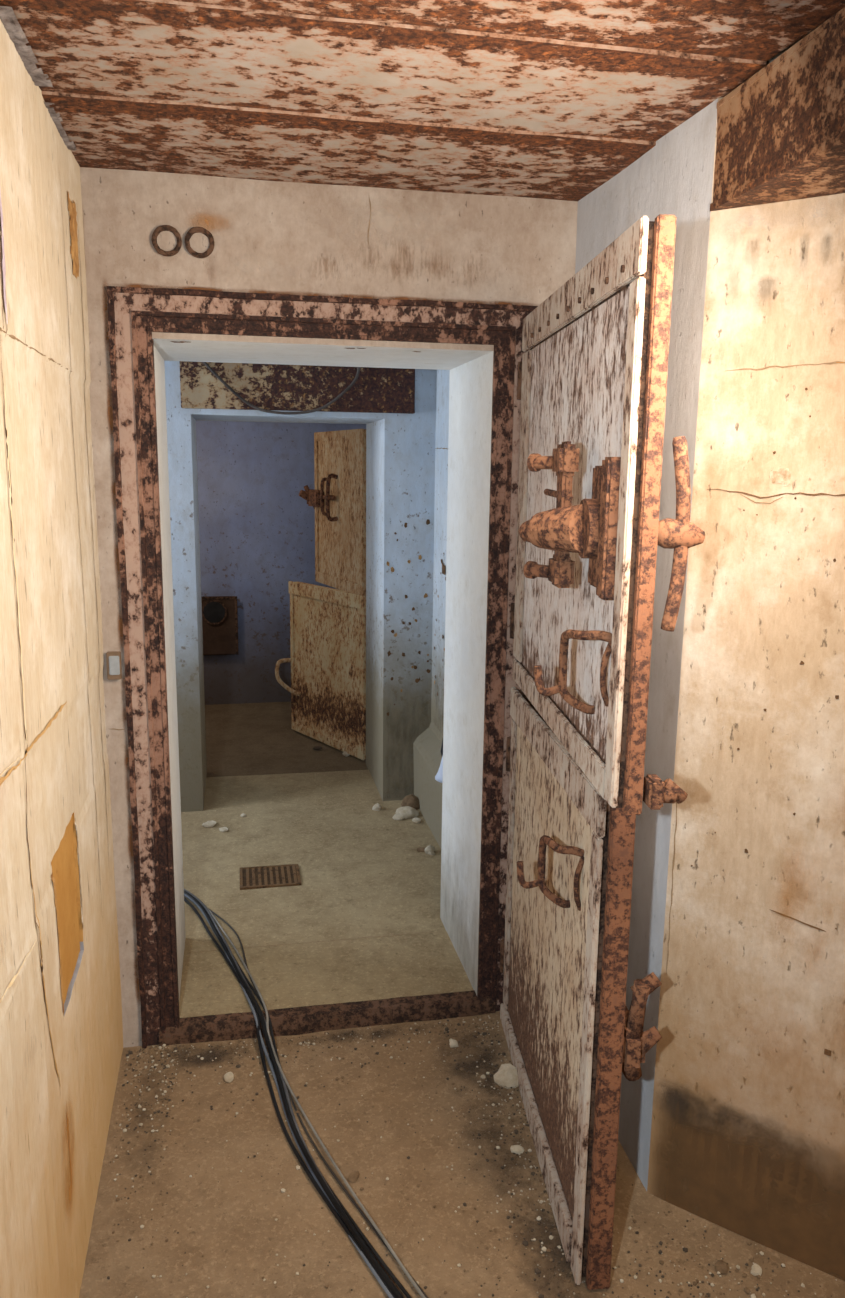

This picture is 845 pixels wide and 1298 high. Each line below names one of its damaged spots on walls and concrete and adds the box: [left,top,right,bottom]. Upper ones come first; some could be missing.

crack [727,361,845,371]
crack [707,489,845,504]
leakage [658,1089,845,1281]